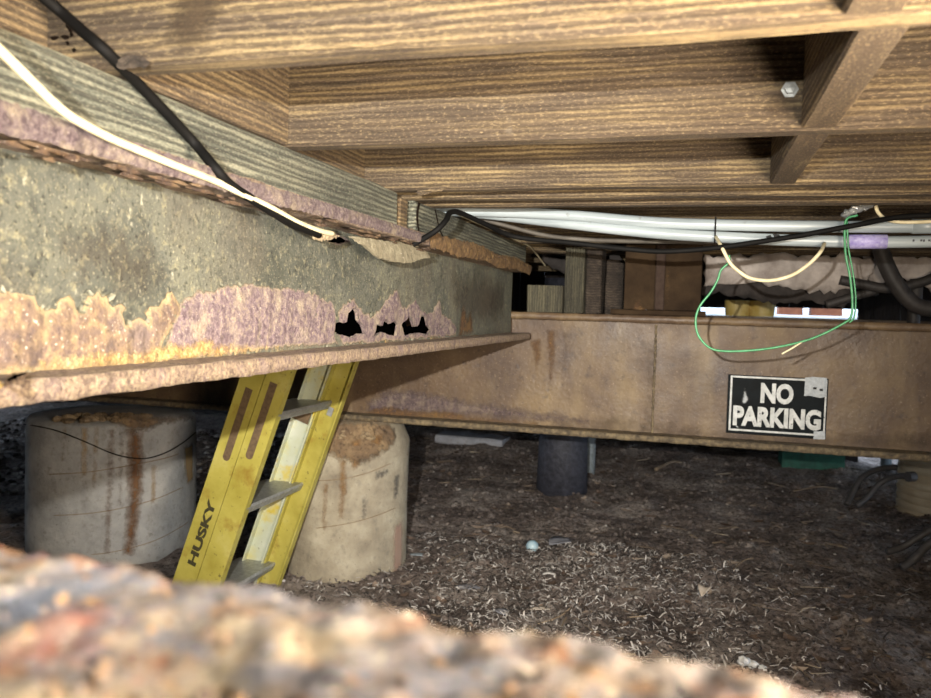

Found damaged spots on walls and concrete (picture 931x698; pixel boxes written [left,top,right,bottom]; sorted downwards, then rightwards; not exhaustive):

corrosion [41,341,267,369]
corrosion [126,432,142,553]